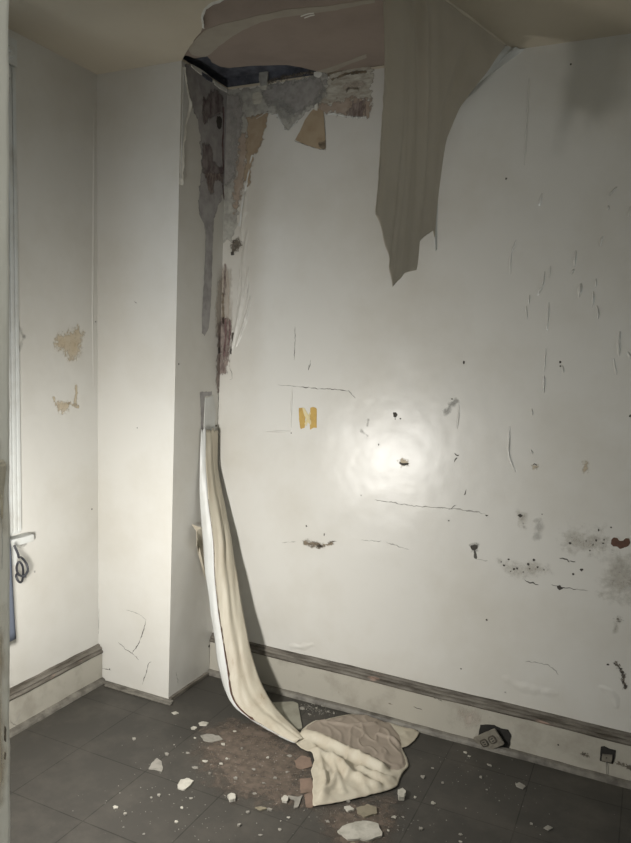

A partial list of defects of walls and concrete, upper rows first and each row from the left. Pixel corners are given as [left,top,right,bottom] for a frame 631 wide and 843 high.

peeling [179,0,525,336]
crack [118,610,150,681]
peeling [191,391,419,809]